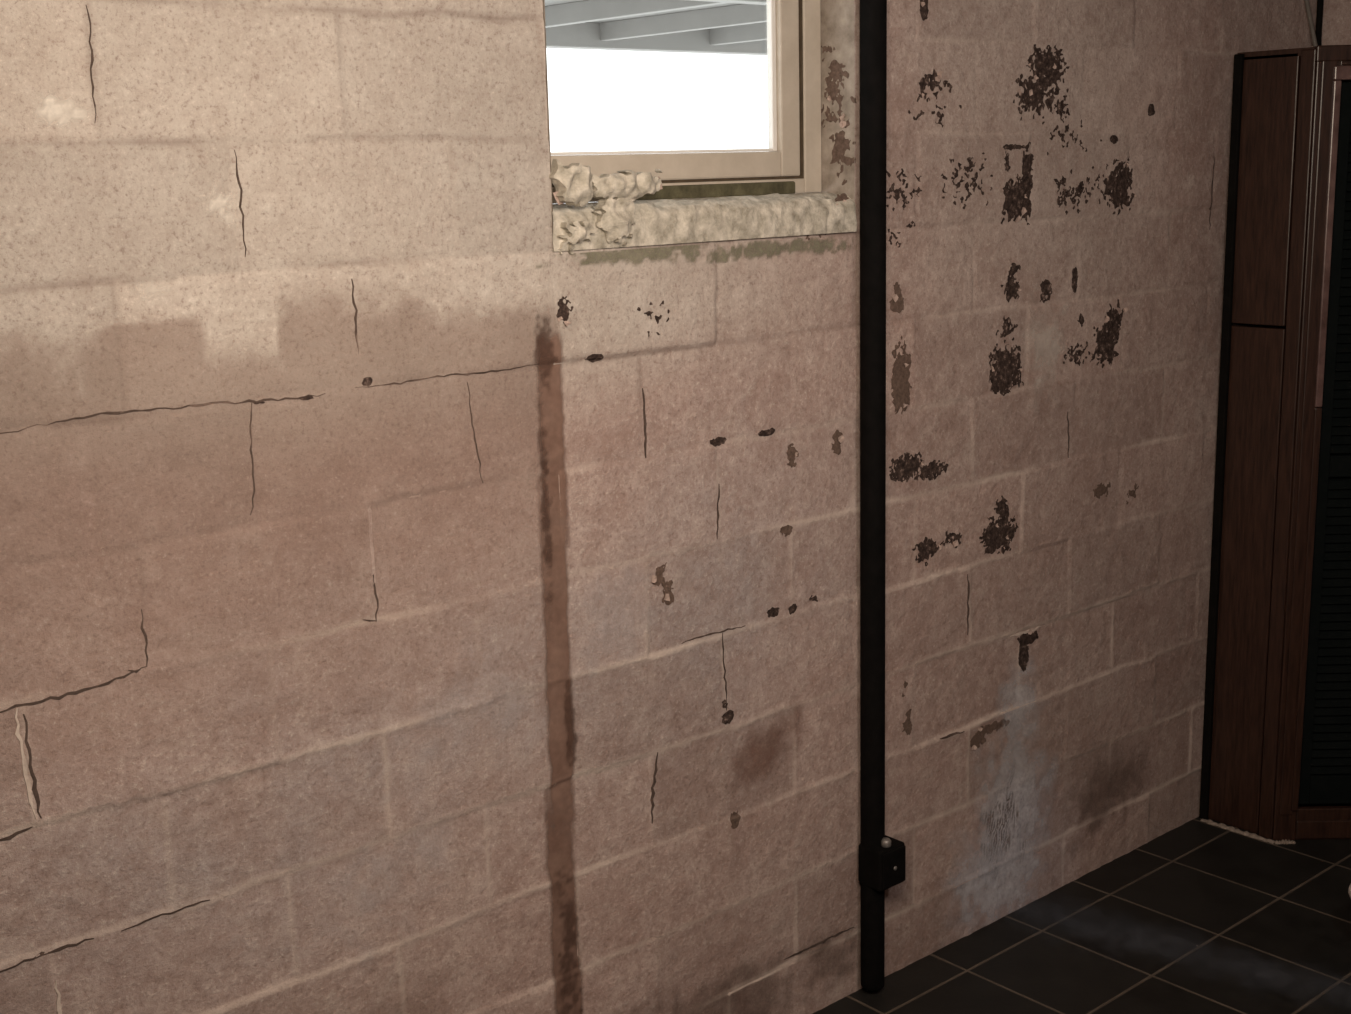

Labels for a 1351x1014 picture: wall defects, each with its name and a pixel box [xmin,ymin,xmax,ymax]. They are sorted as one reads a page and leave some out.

crack [86,5,96,122]
crack [234,150,247,257]
crack [0,609,148,841]
leakage [957,745,1048,919]